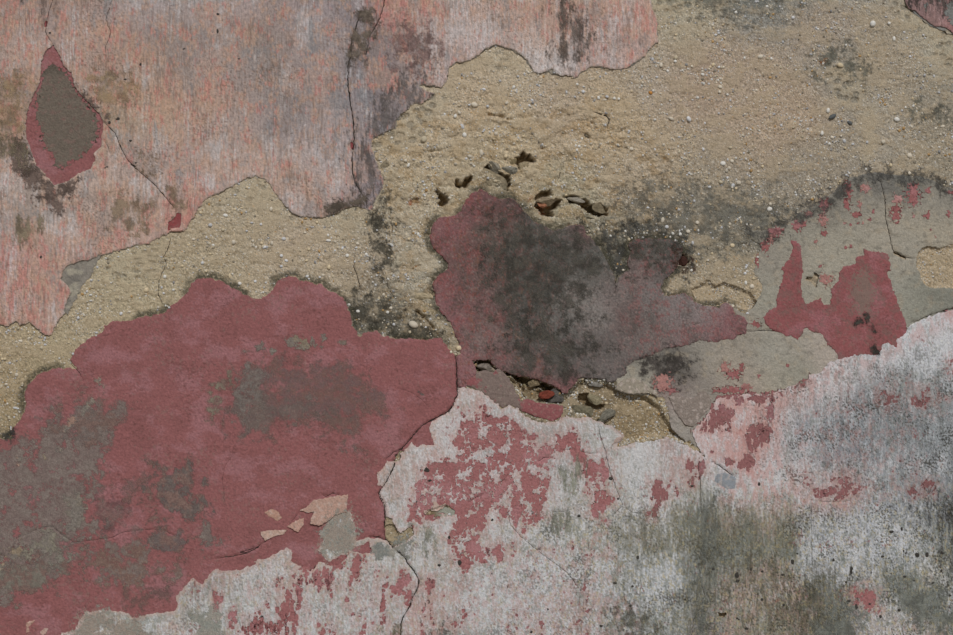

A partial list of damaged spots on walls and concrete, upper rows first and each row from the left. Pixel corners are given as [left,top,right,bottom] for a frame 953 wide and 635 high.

peeling [25,45,103,185]
crack [347,0,385,228]
crack [105,123,172,205]
peeling [763,240,907,359]
peeling [725,423,773,472]
peeling [300,494,348,526]
peeling [320,509,397,591]
crack [374,356,459,635]
peeling [407,404,615,574]
peeling [351,569,418,635]
water stain [600,601,656,635]
water stain [892,576,953,635]